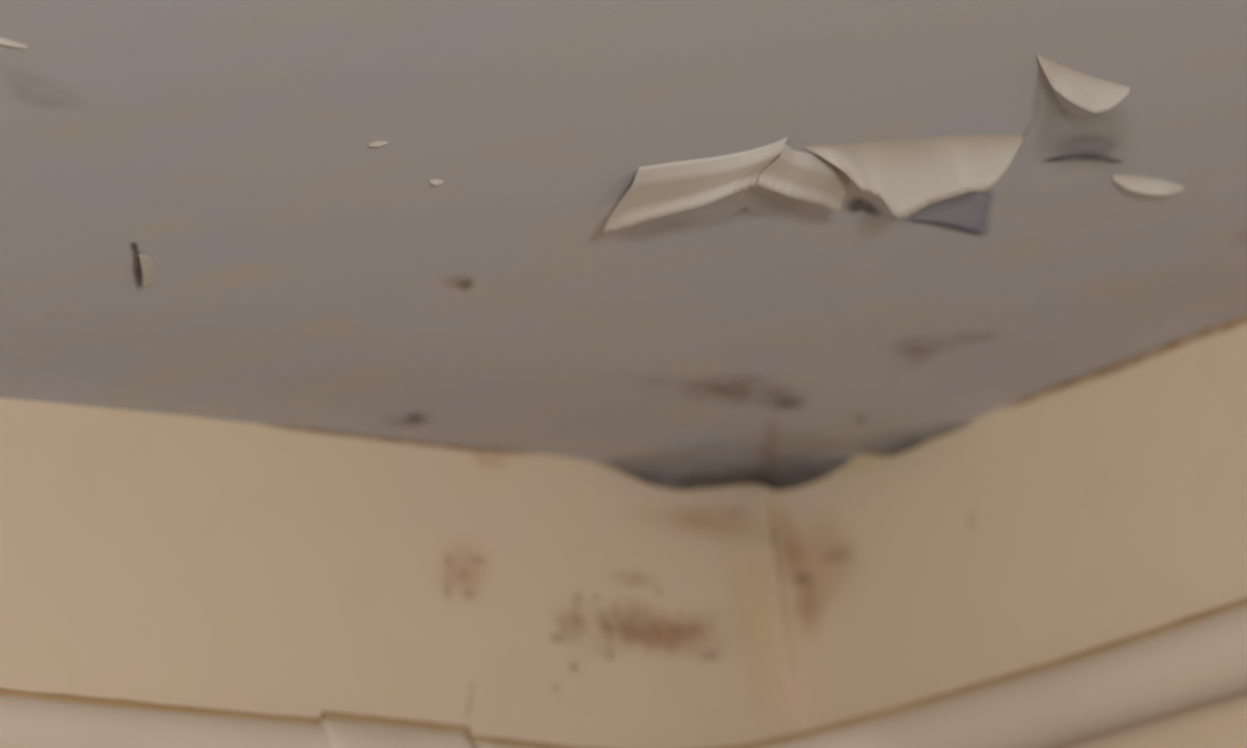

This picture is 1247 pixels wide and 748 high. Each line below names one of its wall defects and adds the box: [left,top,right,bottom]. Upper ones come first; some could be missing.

peeling [1035,53,1131,113]
peeling [602,134,1024,236]
peeling [1112,174,1185,196]
crack [132,244,156,289]